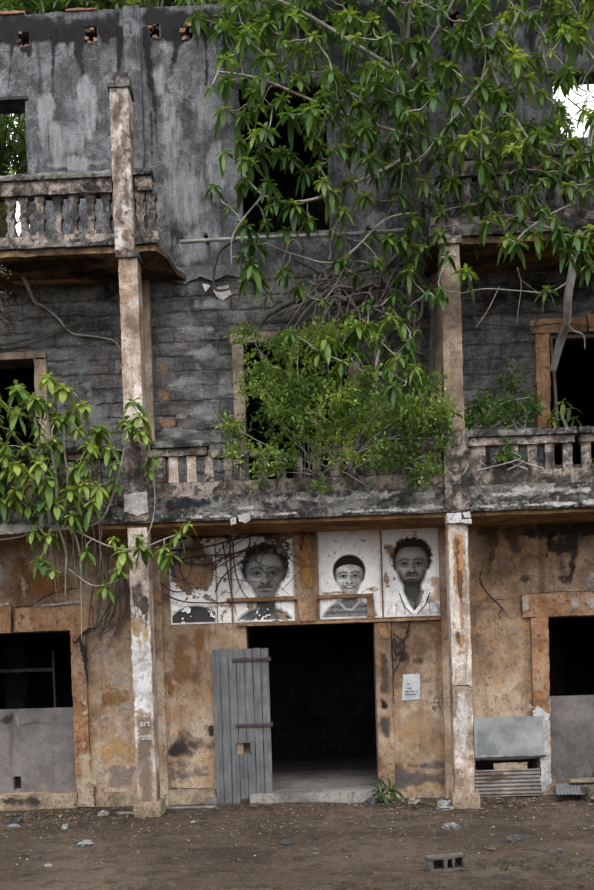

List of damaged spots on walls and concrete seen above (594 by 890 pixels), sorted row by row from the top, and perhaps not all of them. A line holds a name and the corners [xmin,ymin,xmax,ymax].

water stain [0,12,123,96]
peeling [154,67,180,157]
flaking render [170,143,241,301]
peeling [461,511,472,578]
crack [479,561,594,619]
water stain [524,522,594,584]
peeling [99,606,153,720]
peeling [448,534,472,753]